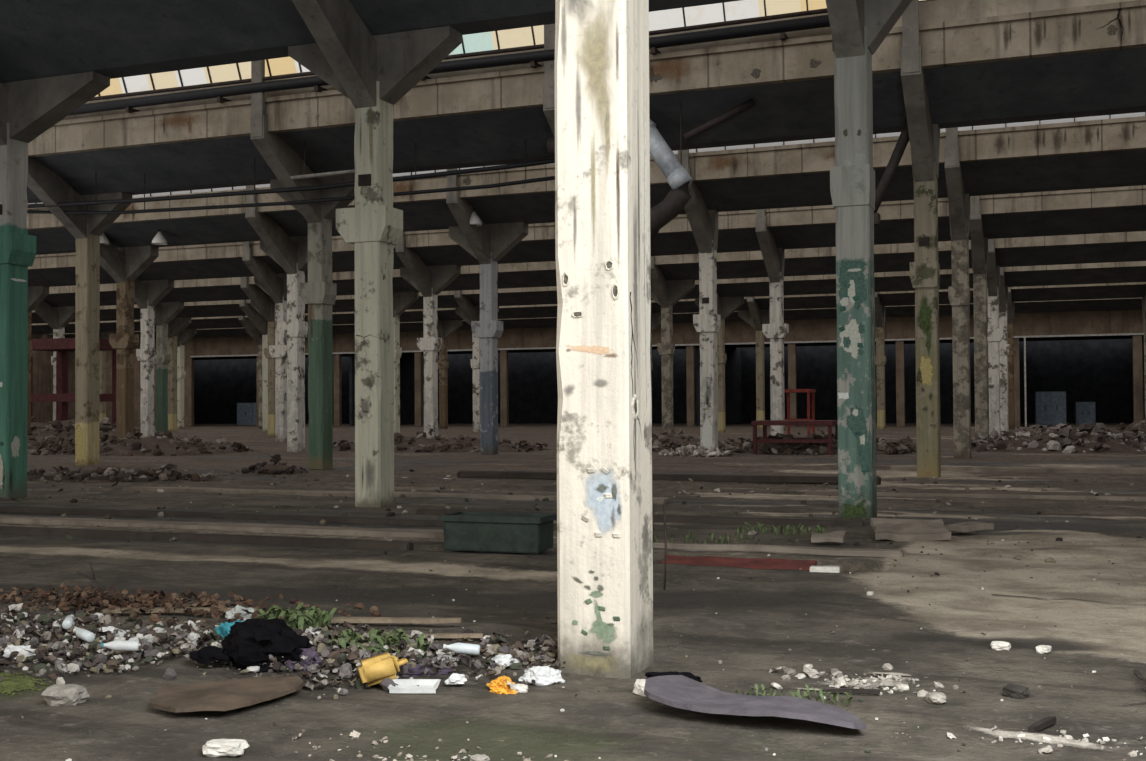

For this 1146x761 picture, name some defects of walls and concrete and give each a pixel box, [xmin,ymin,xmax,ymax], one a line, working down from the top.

crack [1096,9,1124,41]
leakage [577,30,609,225]
peeling [838,260,867,359]
peeling [920,356,933,415]
peeling [0,436,20,489]
peeling [581,467,621,538]
peeling [838,392,870,475]
peeling [572,570,620,655]